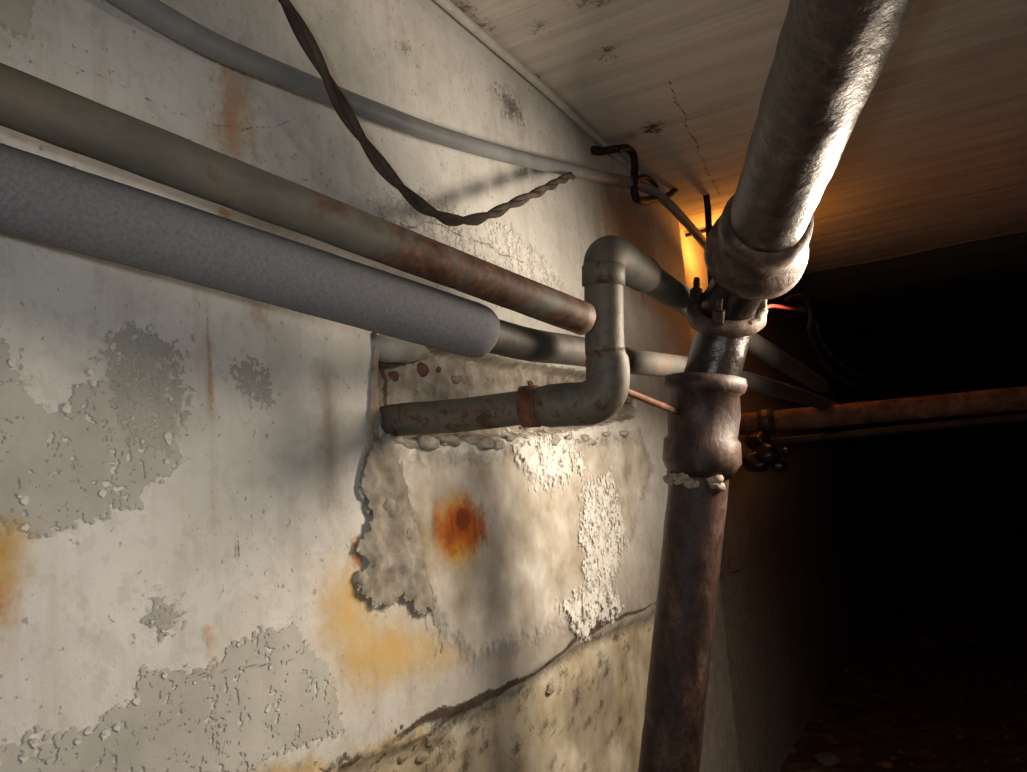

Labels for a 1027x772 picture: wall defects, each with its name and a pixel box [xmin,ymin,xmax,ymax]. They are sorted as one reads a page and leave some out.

peeling [0,320,196,539]
peeling [220,349,276,411]
corrosion [435,500,486,562]
flaking render [349,332,654,772]
peeling [0,621,347,772]
water stain [332,579,434,680]
crack [319,603,656,772]